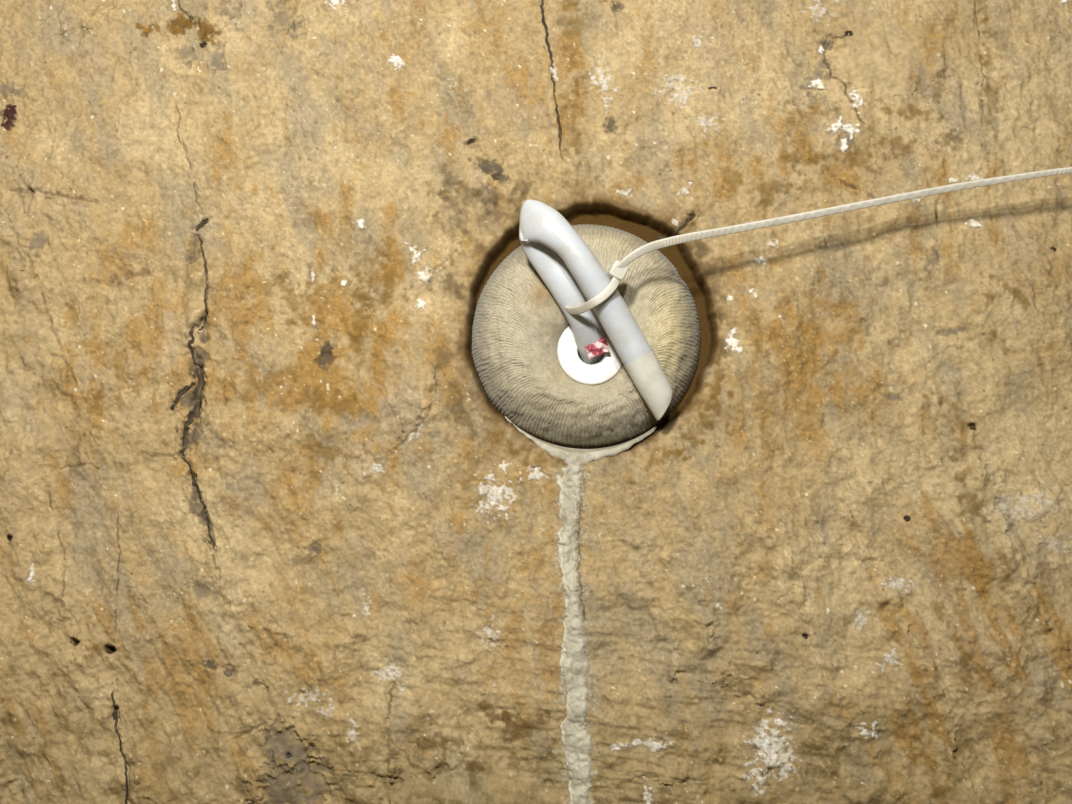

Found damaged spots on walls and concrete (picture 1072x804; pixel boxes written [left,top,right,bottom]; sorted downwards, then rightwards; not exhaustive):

crack [540,0,562,150]
crack [170,218,215,548]
leakage [475,454,598,804]
crack [111,692,128,804]
leakage [611,738,672,752]